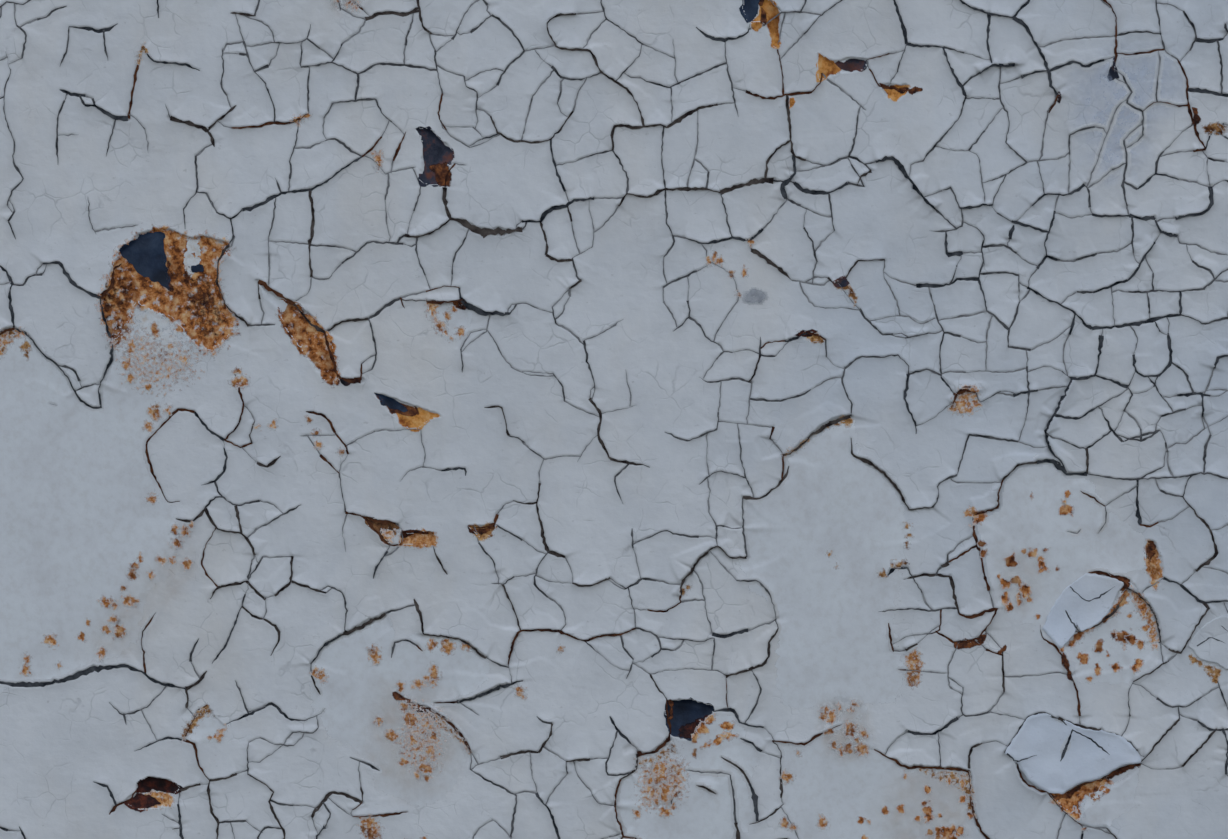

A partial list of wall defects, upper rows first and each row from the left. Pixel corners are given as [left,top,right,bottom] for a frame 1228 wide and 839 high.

peeling [416,126,454,187]
crack [165,0,1228,736]
peeling [0,224,241,694]
peeling [123,776,183,812]
crack [0,614,406,839]
rust [309,665,329,686]
rust [366,643,383,666]
rust [372,637,473,784]
crack [177,406,827,839]
rust [632,741,690,820]
peeling [619,697,759,839]
crack [874,526,1101,789]